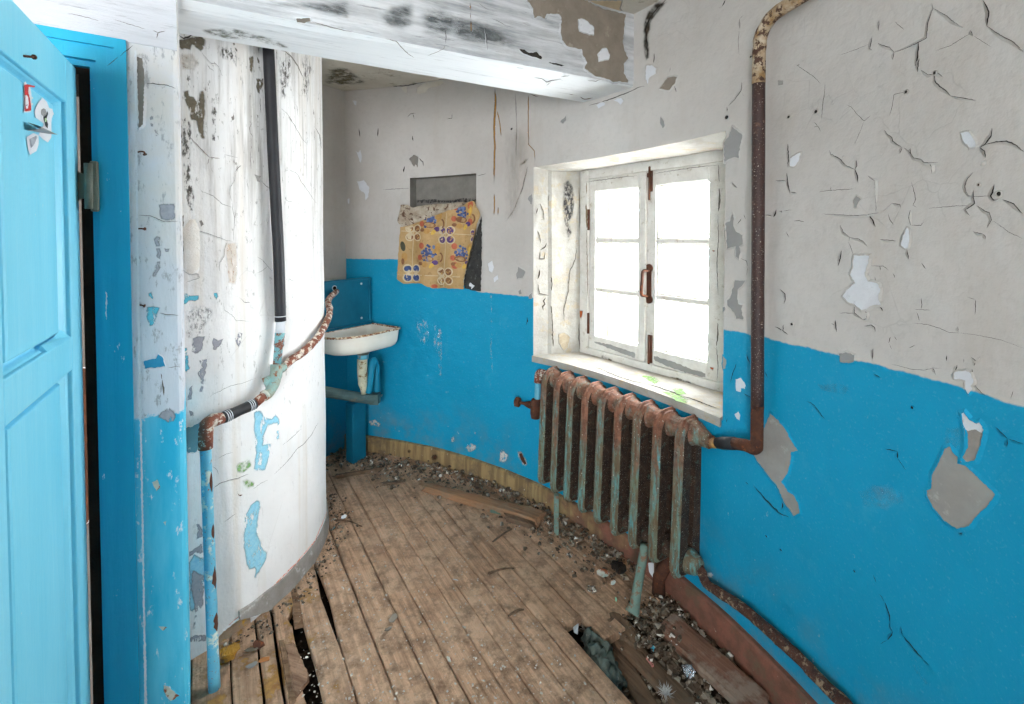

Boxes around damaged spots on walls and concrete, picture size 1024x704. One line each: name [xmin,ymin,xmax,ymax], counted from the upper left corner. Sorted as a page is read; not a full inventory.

damp [308,5,346,14]
damp [328,69,362,84]
damp [387,7,410,26]
damp [426,12,504,43]
peeling [525,0,630,85]
crack [844,0,1023,102]
rust [493,93,501,176]
crack [523,64,1024,400]
peeling [840,252,884,313]
peeling [752,410,802,519]
peeling [923,368,1001,533]
crack [874,577,929,666]